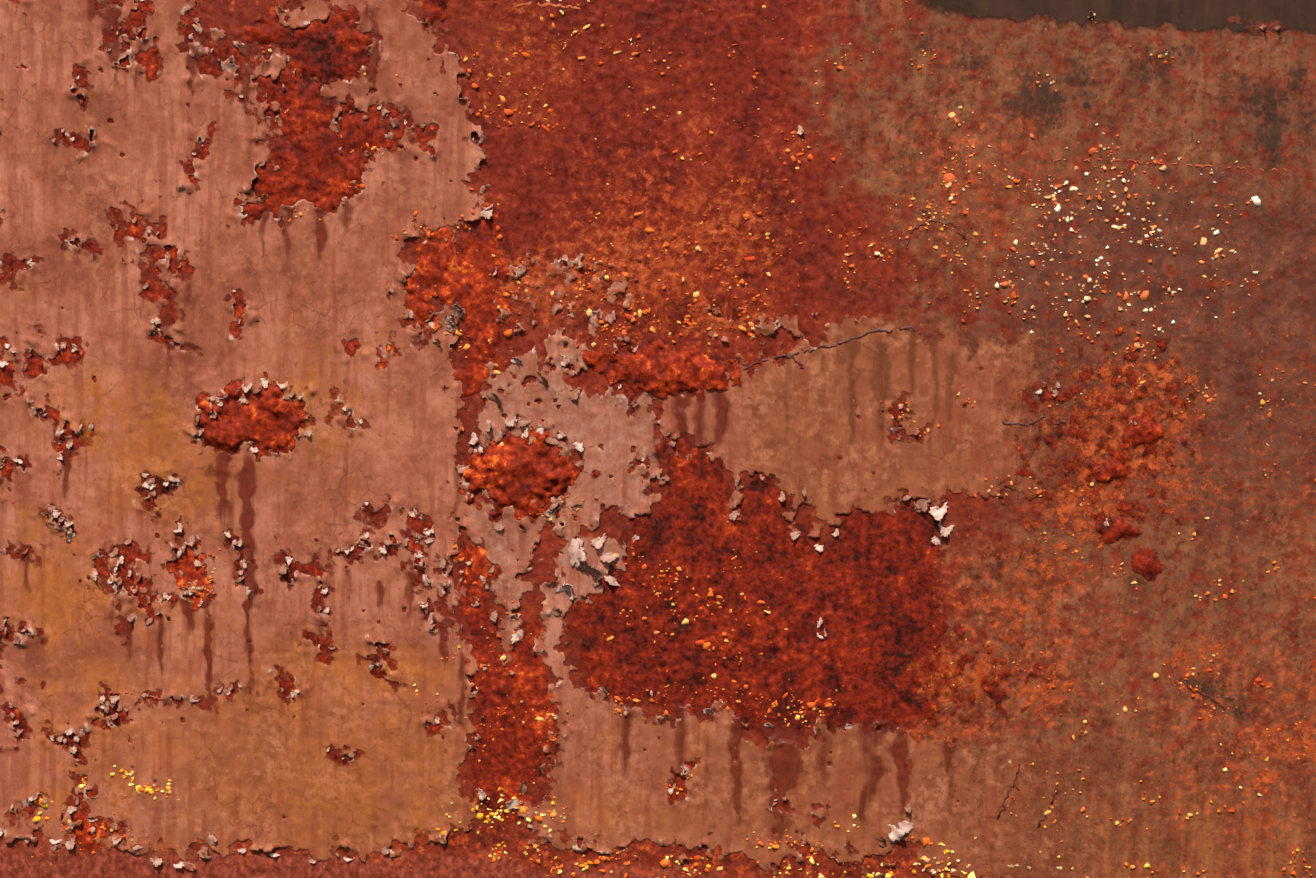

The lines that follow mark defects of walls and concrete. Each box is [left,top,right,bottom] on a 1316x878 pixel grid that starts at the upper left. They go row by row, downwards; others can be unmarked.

peeling [179,6,439,228]
peeling [0,336,97,460]
peeling [92,522,213,633]
peeling [194,372,315,458]
rust [444,120,818,447]
peeling [326,196,955,829]
crack [728,326,916,382]
rust [827,106,1228,832]
rust [1193,196,1261,306]
peeling [46,692,200,868]
rust [607,537,847,878]
rust [866,837,976,878]